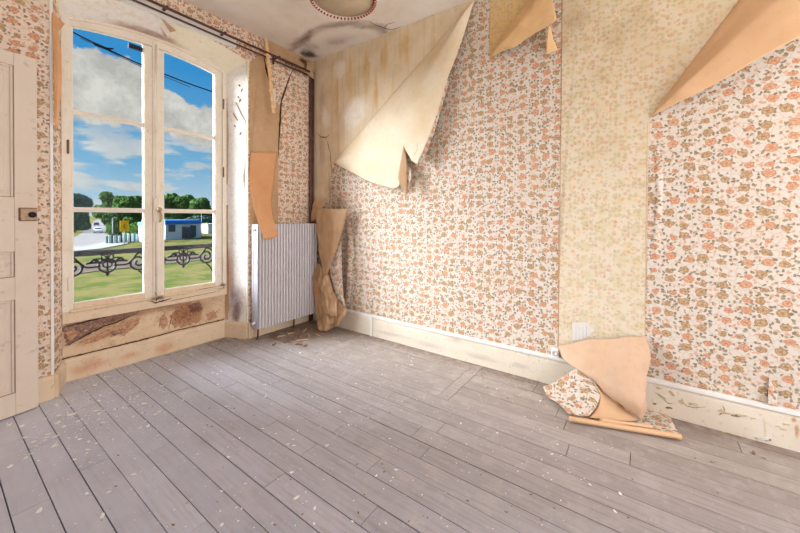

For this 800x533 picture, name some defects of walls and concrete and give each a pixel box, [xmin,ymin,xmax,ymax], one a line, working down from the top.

peeling [249,0,475,224]
peeling [557,0,739,357]
flaking render [62,310,141,346]
peeling [653,387,700,409]
peeling [718,405,771,441]